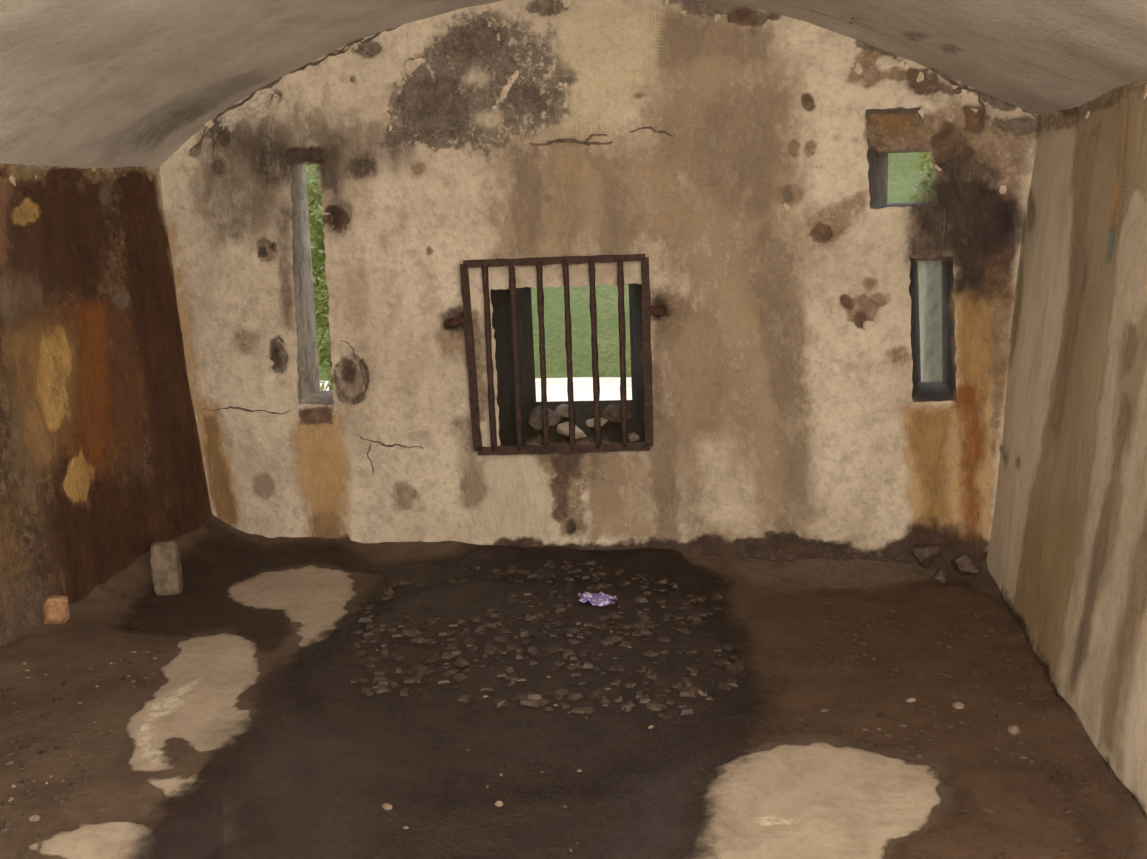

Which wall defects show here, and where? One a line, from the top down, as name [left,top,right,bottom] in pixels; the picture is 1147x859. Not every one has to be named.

crack [530,126,674,146]
peeling [849,40,1147,229]
leakage [0,384,58,647]
crack [202,406,292,414]
corrosion [295,406,349,539]
crack [355,434,423,474]
leakage [164,83,1147,859]
corrosion [904,276,1013,545]
leakage [116,523,376,651]